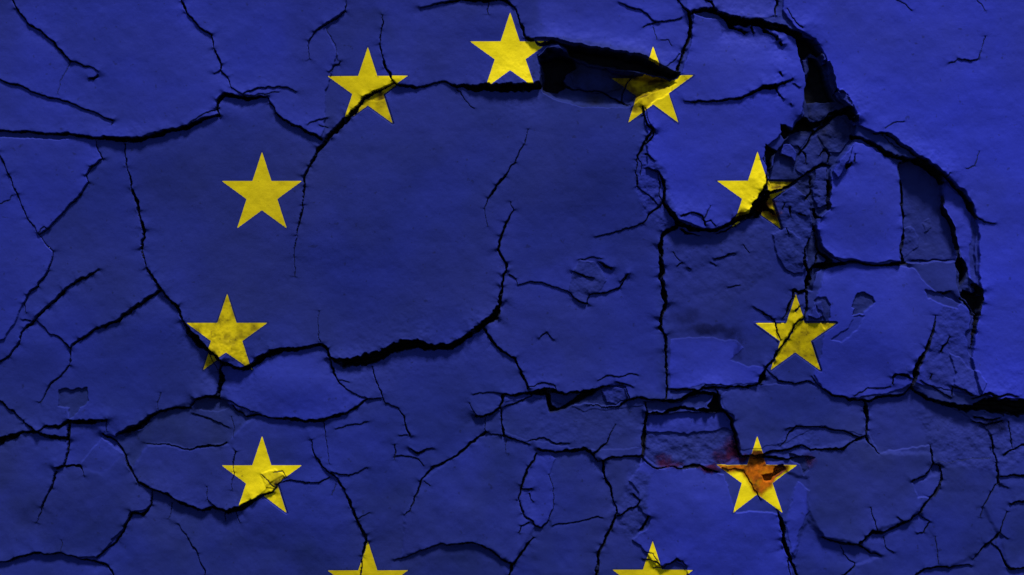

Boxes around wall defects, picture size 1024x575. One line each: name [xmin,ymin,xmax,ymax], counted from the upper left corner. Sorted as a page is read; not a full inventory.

peeling [535,39,681,108]
crack [620,0,820,75]
crack [685,78,794,104]
spalling [765,37,860,323]
crack [0,0,634,523]
peeling [898,161,978,317]
crack [518,106,1024,575]
peeling [852,293,876,315]
crack [0,431,369,575]
corrosion [701,441,788,495]
crack [395,537,535,575]